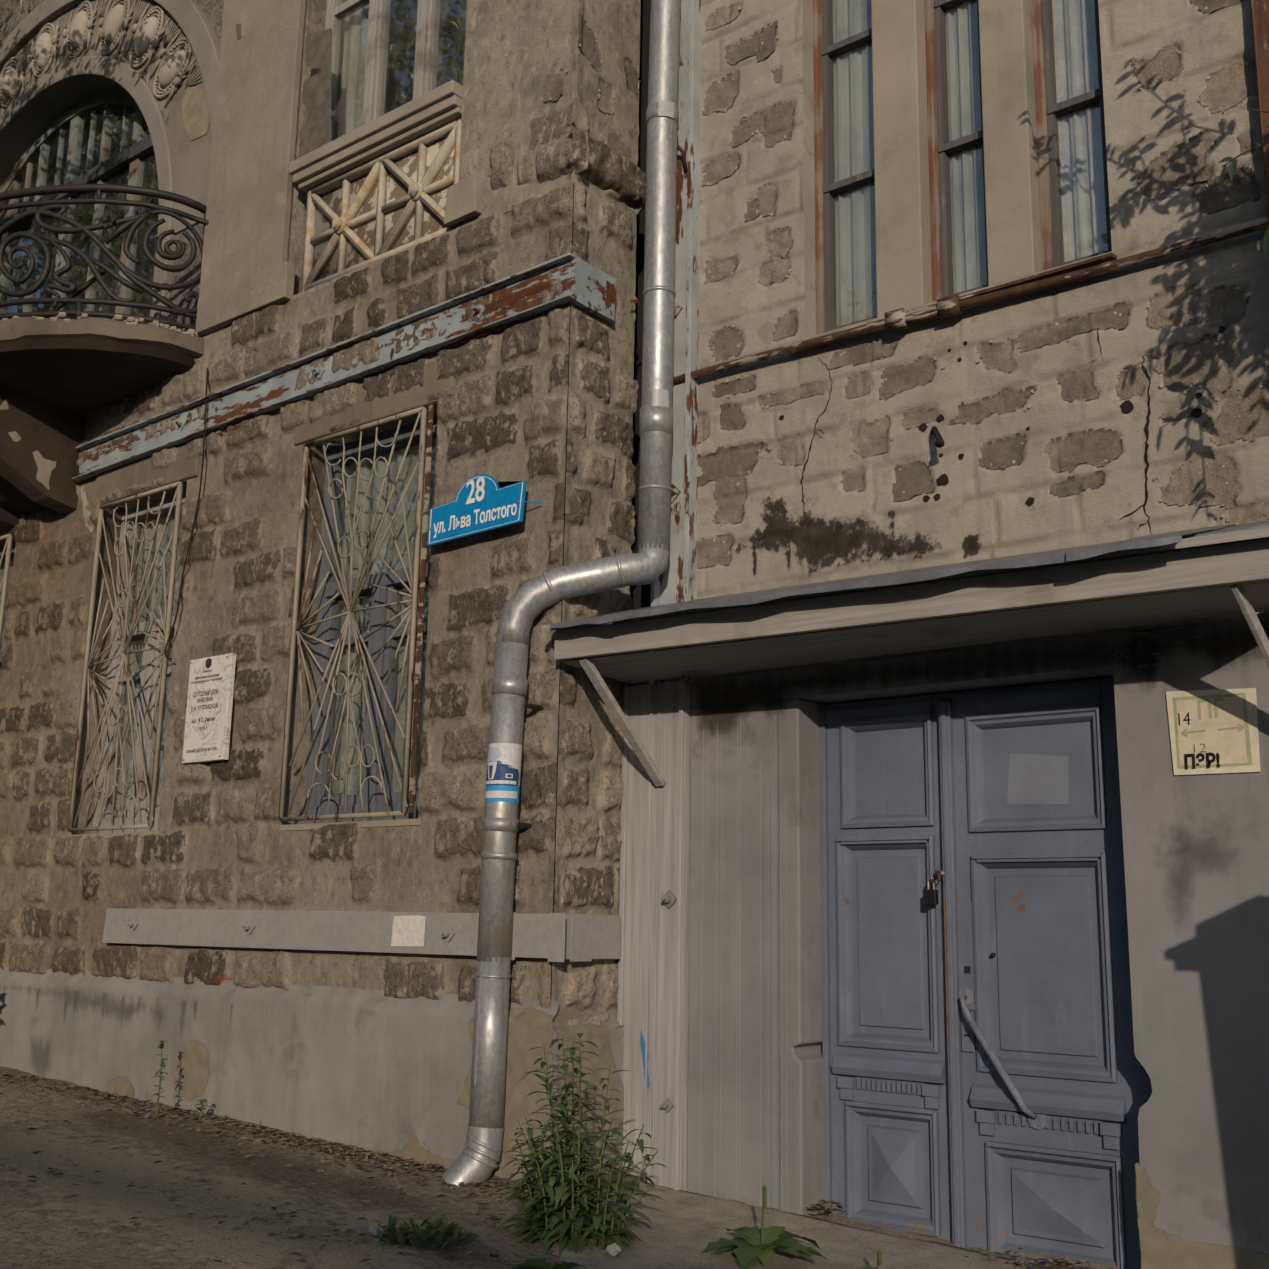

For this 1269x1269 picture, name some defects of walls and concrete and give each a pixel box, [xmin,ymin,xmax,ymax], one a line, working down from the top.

peeling [33,450,56,490]
spalling [709,325,744,361]
spalling [696,374,824,569]
spalling [773,311,798,341]
crack [800,357,832,518]
spalling [893,453,949,502]
spalling [840,385,1037,492]
spalling [829,301,1130,402]
spalling [1044,428,1124,497]
crack [1119,355,1152,534]
spalling [1116,282,1269,511]
water stain [736,496,940,575]